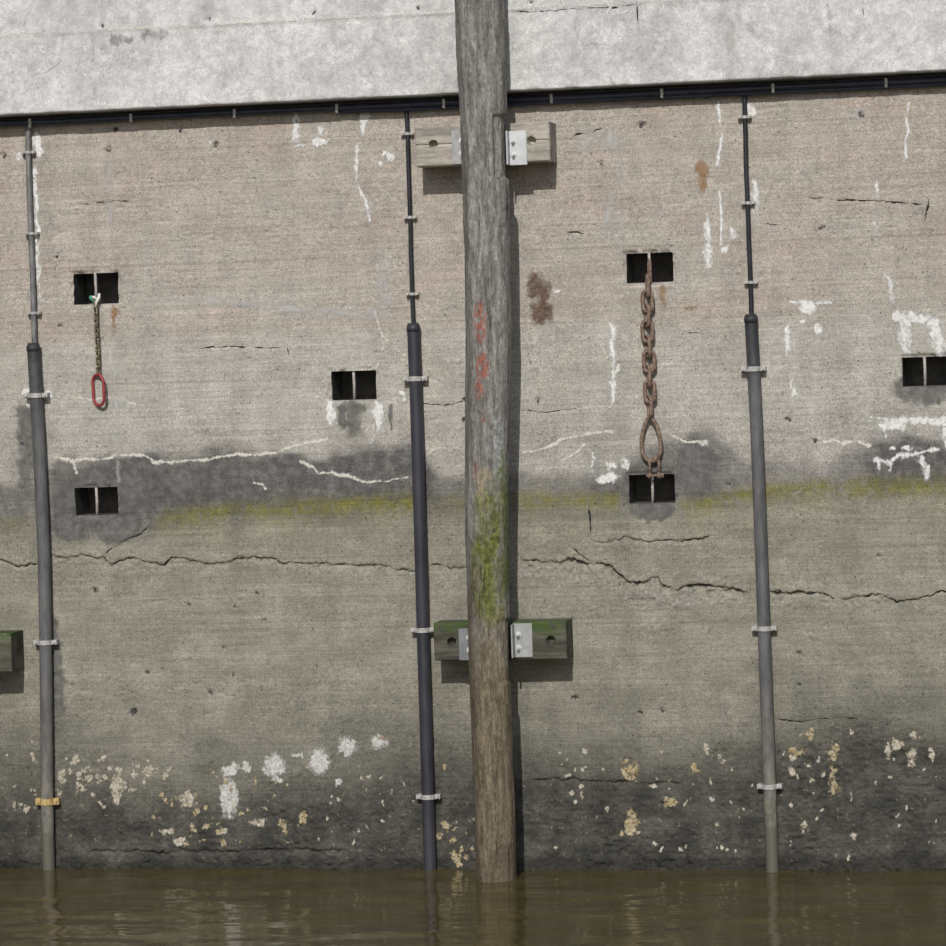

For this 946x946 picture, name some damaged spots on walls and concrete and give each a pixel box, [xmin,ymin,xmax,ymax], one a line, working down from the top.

crack [809,180,929,236]
rust [527,273,552,324]
leakage [884,274,946,357]
leakage [869,378,946,480]
crack [53,437,409,484]
crack [1,526,454,578]
crack [516,506,746,610]
crack [769,589,946,611]